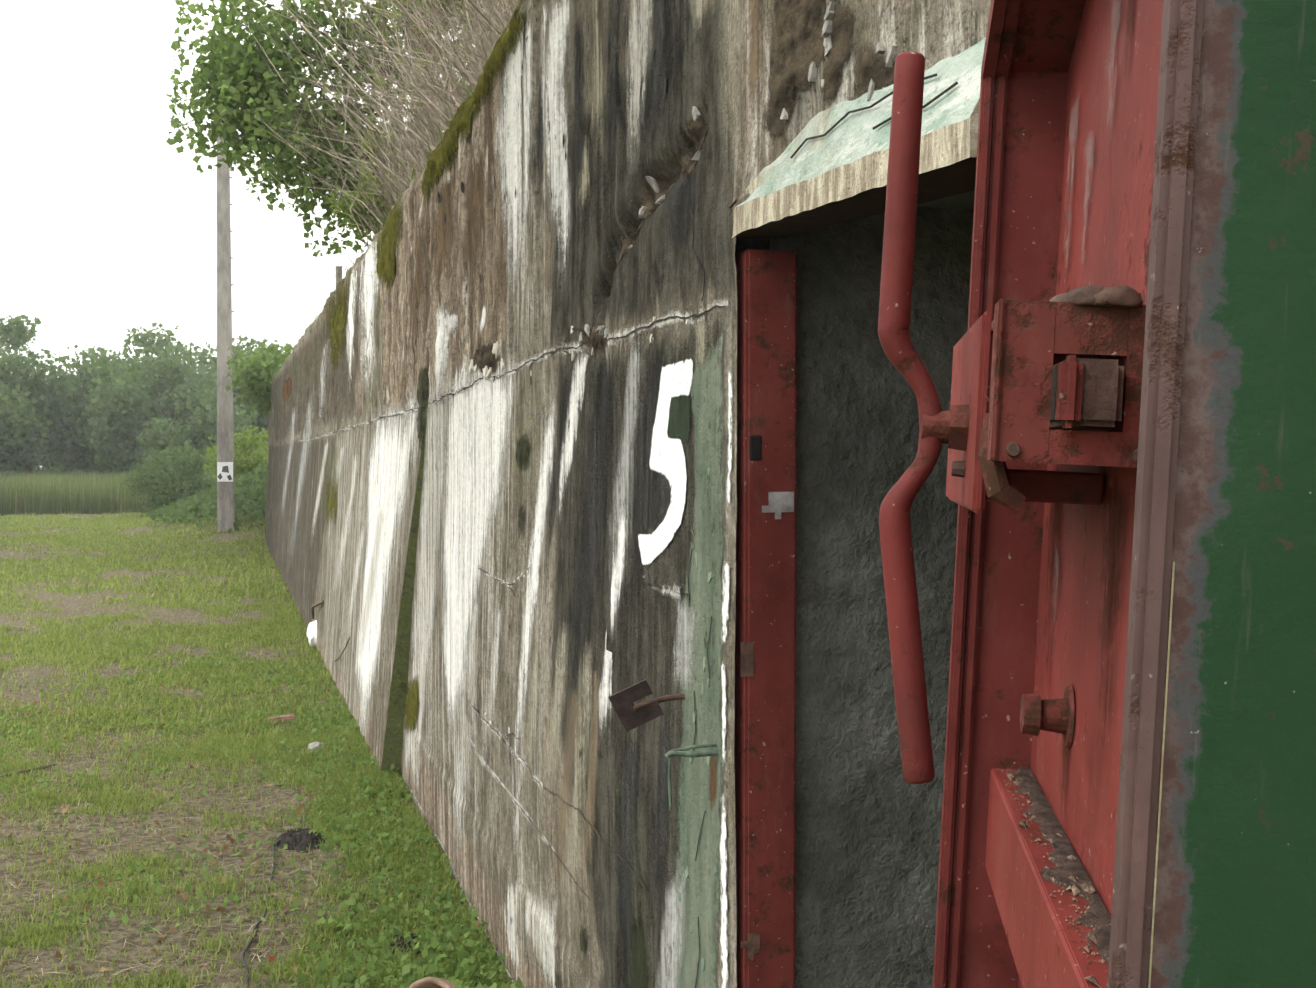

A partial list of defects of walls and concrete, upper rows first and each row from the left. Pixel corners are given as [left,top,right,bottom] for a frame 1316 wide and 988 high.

leakage [346,242,381,381]
leakage [413,180,453,351]
leakage [468,156,483,270]
crack [298,206,728,442]
leakage [480,0,705,330]
spalling [616,106,709,265]
leakage [687,321,705,369]
leakage [282,308,514,826]
leakage [514,349,665,891]